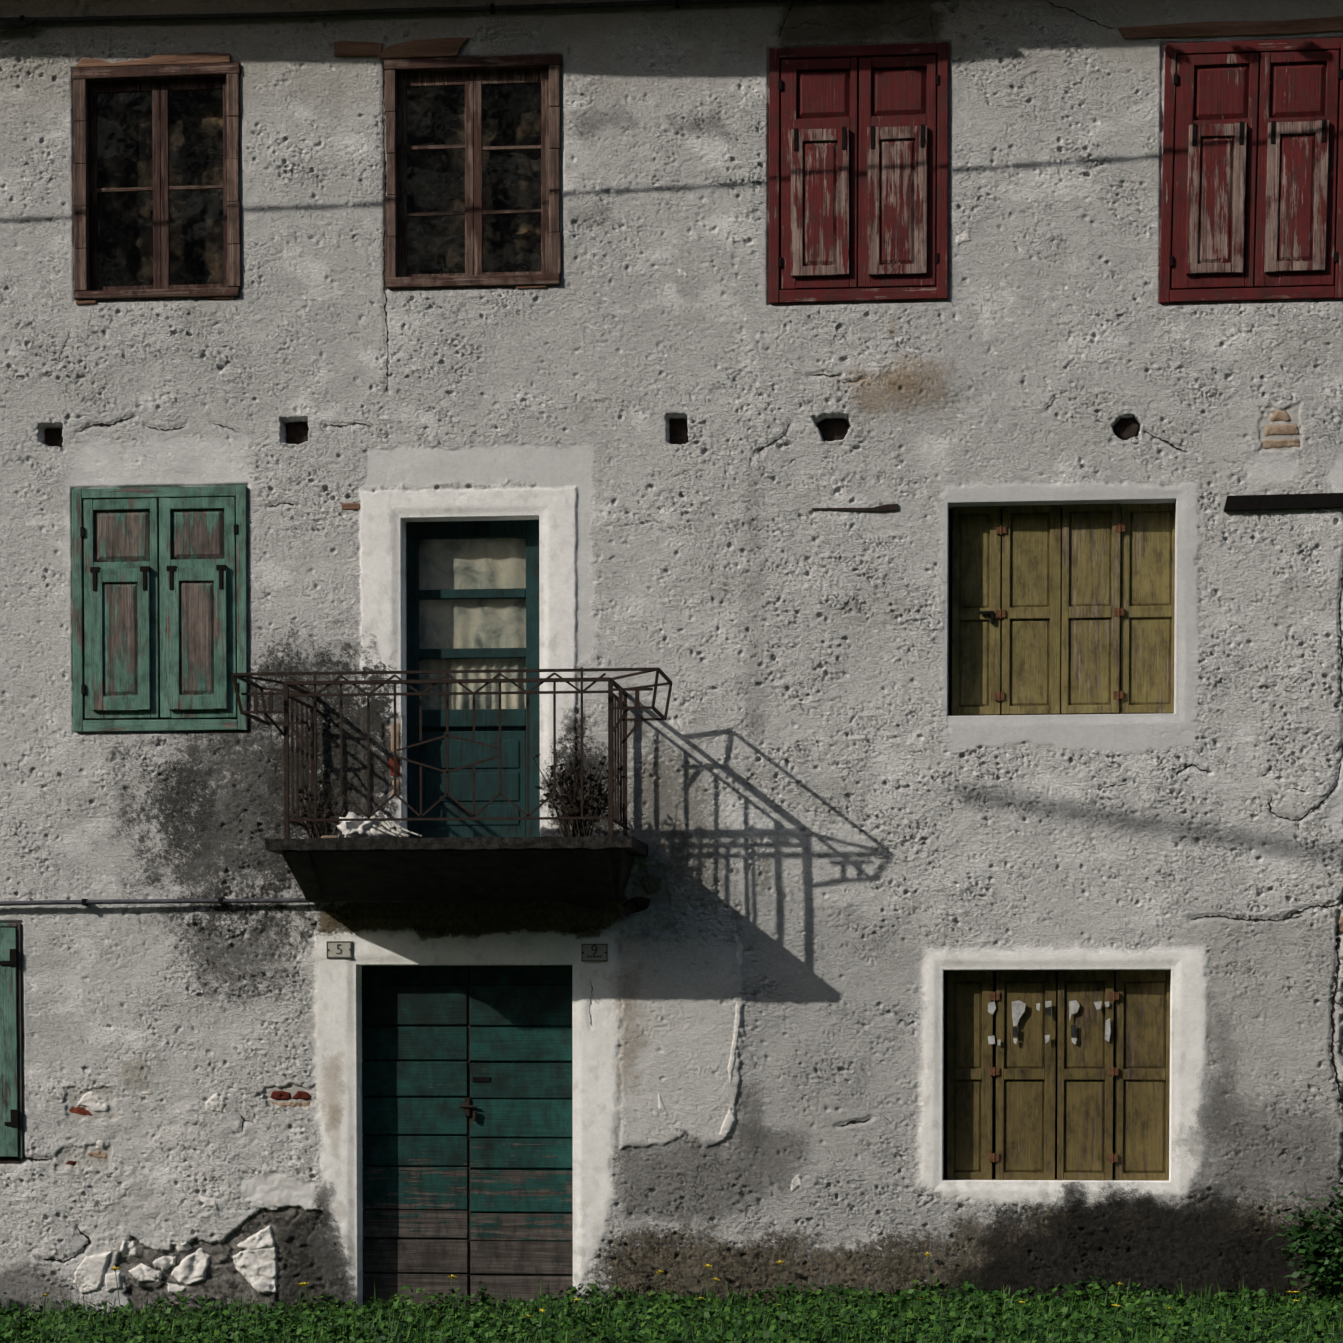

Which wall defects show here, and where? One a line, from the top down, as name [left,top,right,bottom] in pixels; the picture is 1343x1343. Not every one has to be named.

crack [1262,557,1343,829]
leakage [108,621,638,1004]
peeling [727,1003,744,1086]
peeling [718,1107,737,1139]
leakage [0,1257,76,1319]
peeling [73,1206,326,1317]
peeling [791,1174,802,1192]
leakage [592,1126,1340,1311]